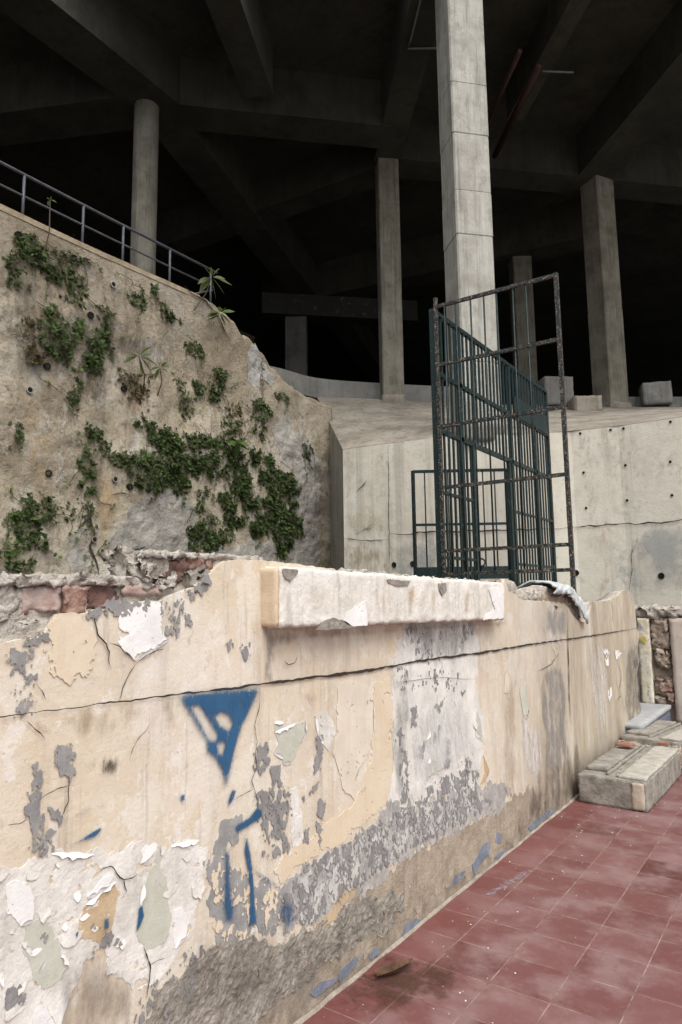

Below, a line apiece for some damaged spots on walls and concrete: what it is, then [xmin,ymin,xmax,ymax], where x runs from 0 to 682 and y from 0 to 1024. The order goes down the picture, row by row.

flaking render [65,547,92,572]
crack [0,603,635,809]
leakage [543,670,578,796]
flaking render [0,573,554,1024]
leakage [367,962,452,1004]